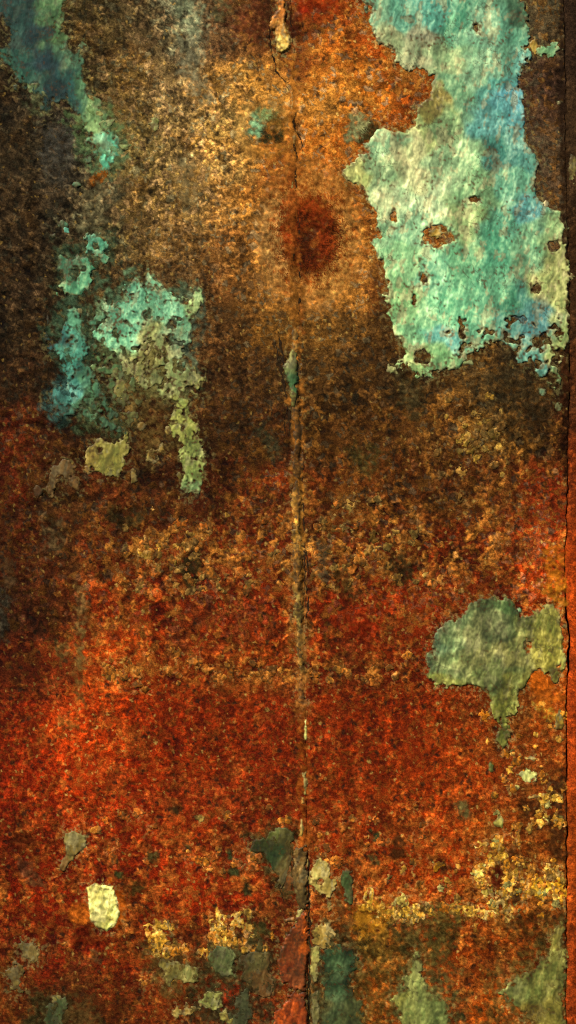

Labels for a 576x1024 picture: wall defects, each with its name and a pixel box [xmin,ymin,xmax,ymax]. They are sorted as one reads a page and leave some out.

corrosion [262,0,338,53]
corrosion [260,167,359,306]
peeling [342,0,575,412]
peeling [33,233,207,498]
corrosion [121,518,254,596]
corrosion [305,495,465,594]
peeling [426,597,566,748]
peeling [86,883,120,932]
peeling [307,858,364,1024]
corrosion [284,813,427,910]
corrosion [432,668,570,919]
peeling [498,920,569,1024]